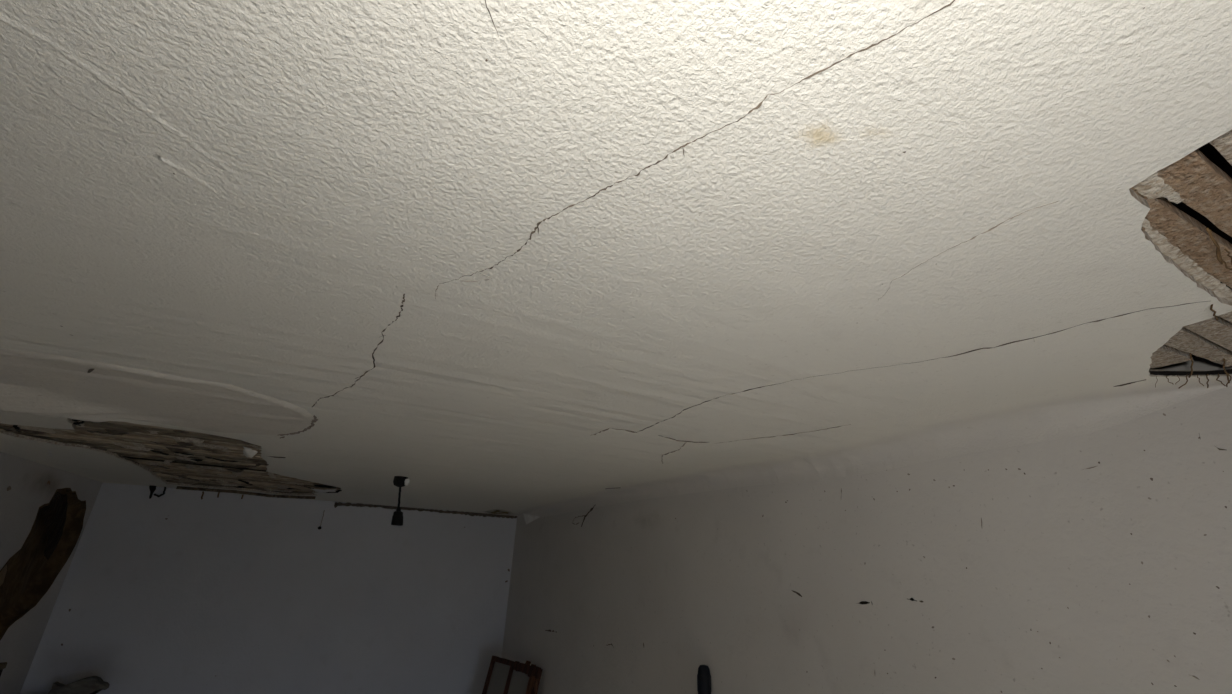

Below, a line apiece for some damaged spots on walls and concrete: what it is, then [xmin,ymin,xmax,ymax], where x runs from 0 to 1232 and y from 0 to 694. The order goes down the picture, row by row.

crack [435,0,955,299]
crack [878,201,1058,300]
spalling [1131,130,1232,388]
spalling [0,419,342,499]
crack [312,294,405,407]
crack [593,301,1208,464]